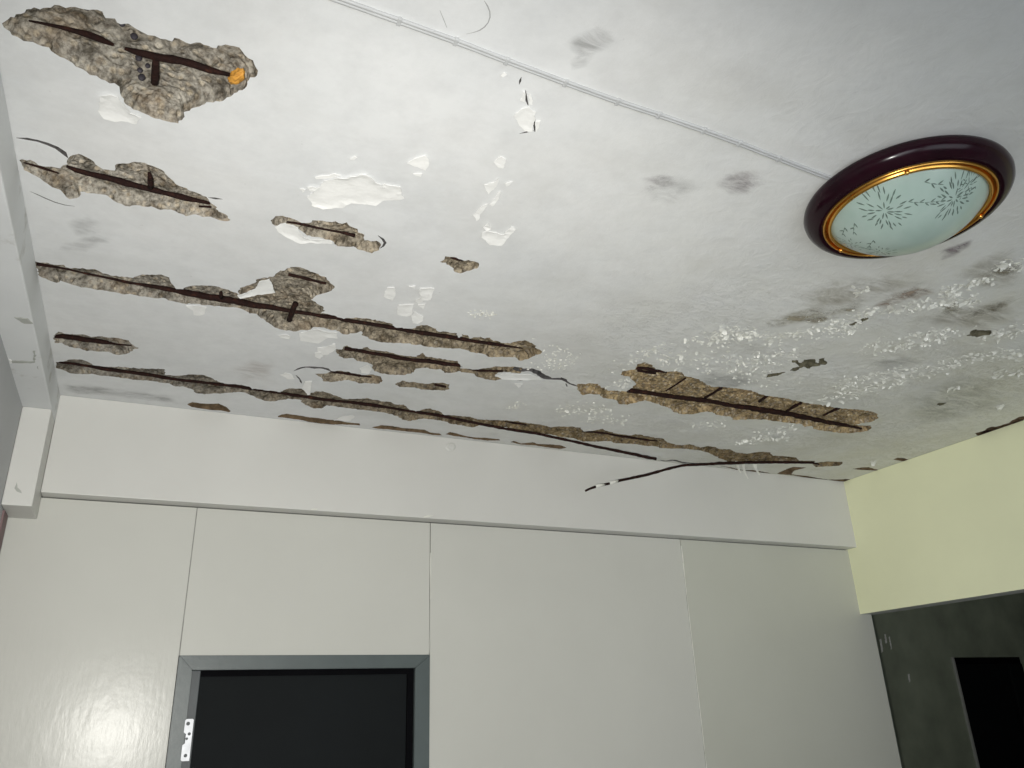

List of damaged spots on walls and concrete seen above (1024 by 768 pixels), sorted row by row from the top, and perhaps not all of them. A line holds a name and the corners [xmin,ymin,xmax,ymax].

spalling [2,5,258,124]
peeling [514,92,540,132]
spalling [20,154,230,221]
peeling [271,173,404,253]
peeling [473,156,516,246]
damp [787,314,826,322]
spalling [35,256,1024,481]